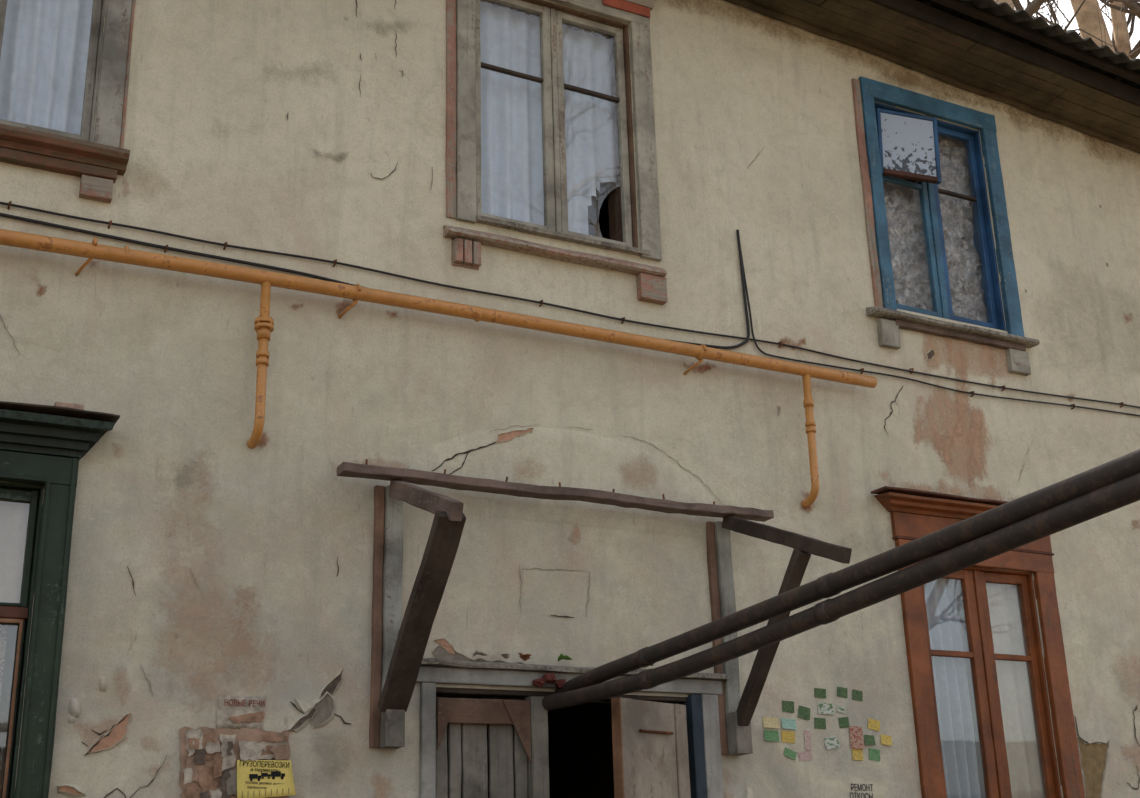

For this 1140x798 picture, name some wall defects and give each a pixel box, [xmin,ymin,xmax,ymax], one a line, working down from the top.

crack [884,386,903,434]
crack [432,424,539,475]
peeling [81,713,131,756]
crack [104,755,167,798]
peeling [1075,716,1110,798]